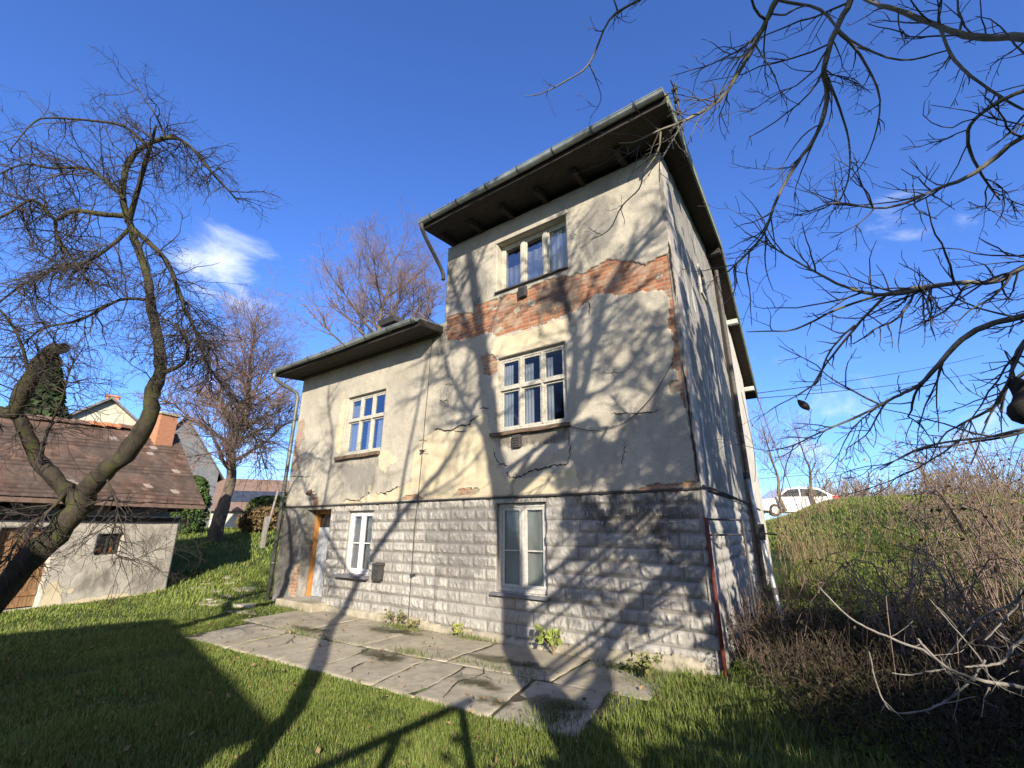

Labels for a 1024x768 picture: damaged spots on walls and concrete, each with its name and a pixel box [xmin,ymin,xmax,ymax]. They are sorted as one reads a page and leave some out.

spalling [446,250,697,454]
crack [419,407,487,454]
crack [493,435,571,479]